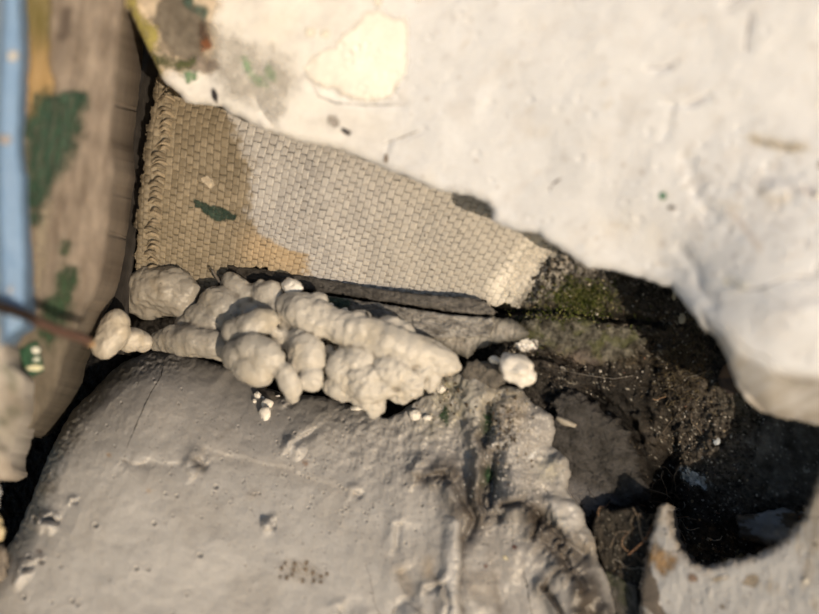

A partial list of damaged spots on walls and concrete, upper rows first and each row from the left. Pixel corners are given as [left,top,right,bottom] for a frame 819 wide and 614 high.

peeling [304,10,408,102]
spalling [328,116,351,135]
crack [128,357,168,444]
spalling [257,388,285,400]
spalling [743,574,759,588]